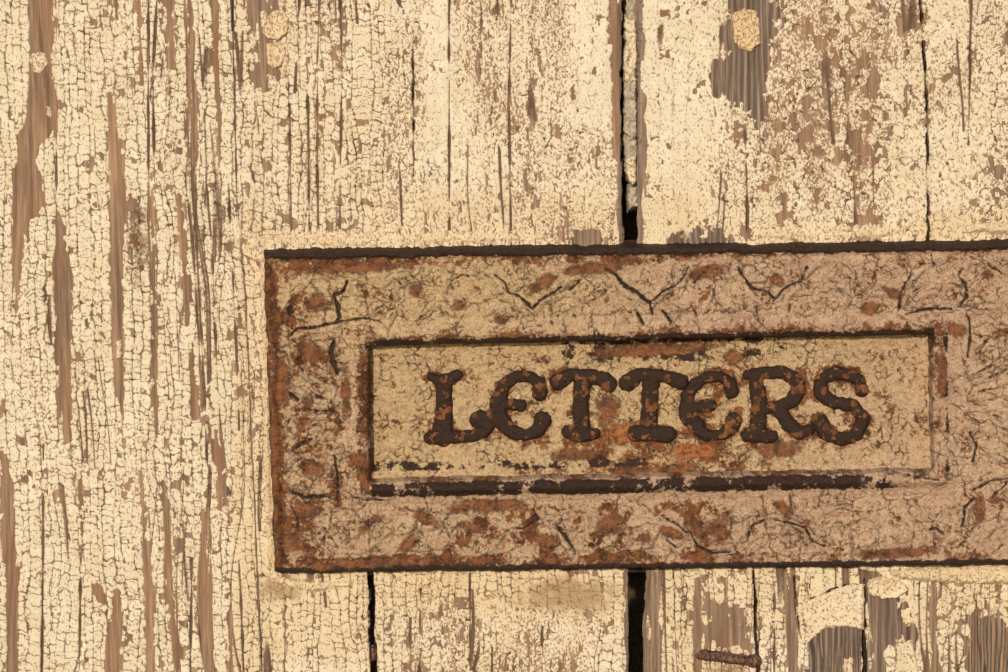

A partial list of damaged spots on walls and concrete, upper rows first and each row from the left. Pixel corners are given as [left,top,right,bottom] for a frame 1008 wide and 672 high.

peeling [709,0,789,156]
crack [919,0,929,165]
peeling [10,0,77,447]
peeling [105,92,128,420]
rust [269,340,336,505]
rust [528,260,634,296]
rust [596,340,744,366]
peeling [0,451,21,672]
crack [367,573,378,672]
rust [445,498,523,534]
rust [637,514,732,546]
peeling [784,570,944,672]